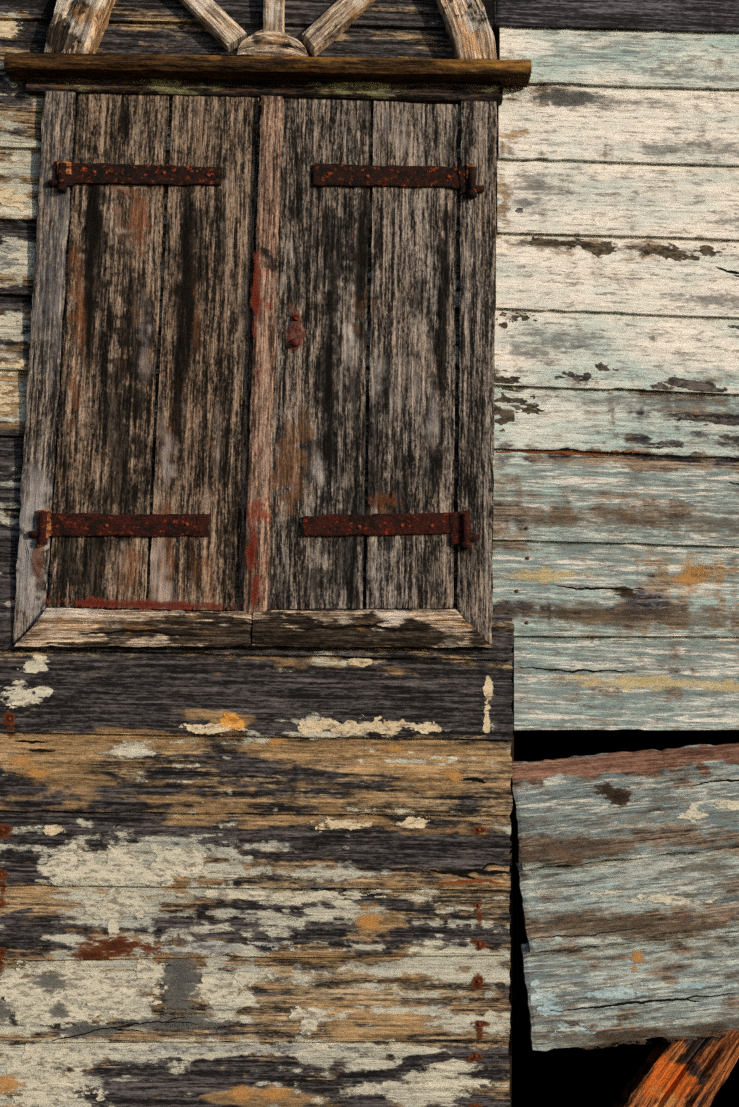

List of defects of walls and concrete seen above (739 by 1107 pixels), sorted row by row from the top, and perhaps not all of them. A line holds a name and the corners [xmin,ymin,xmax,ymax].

corrosion [57,160,71,175]
peeling [530,236,617,258]
peeling [634,243,736,261]
corrosion [32,530,49,582]
corrosion [46,525,262,610]
peeling [179,712,248,735]
peeling [298,714,442,736]
peeling [36,825,207,952]
peeling [204,889,419,903]
corrosion [68,933,163,961]
crack [550,993,733,1012]
peeling [0,940,387,1107]